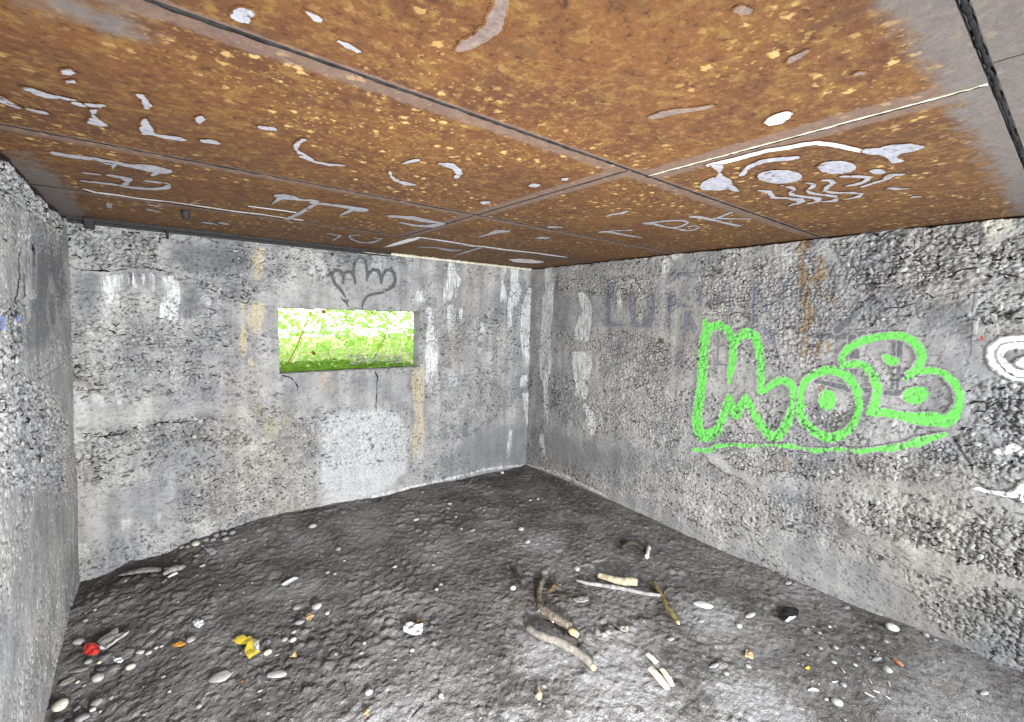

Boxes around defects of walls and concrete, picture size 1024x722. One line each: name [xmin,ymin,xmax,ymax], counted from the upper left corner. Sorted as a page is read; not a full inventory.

leakage [659,253,683,291]
corrosion [792,239,838,366]
leakage [422,267,763,500]